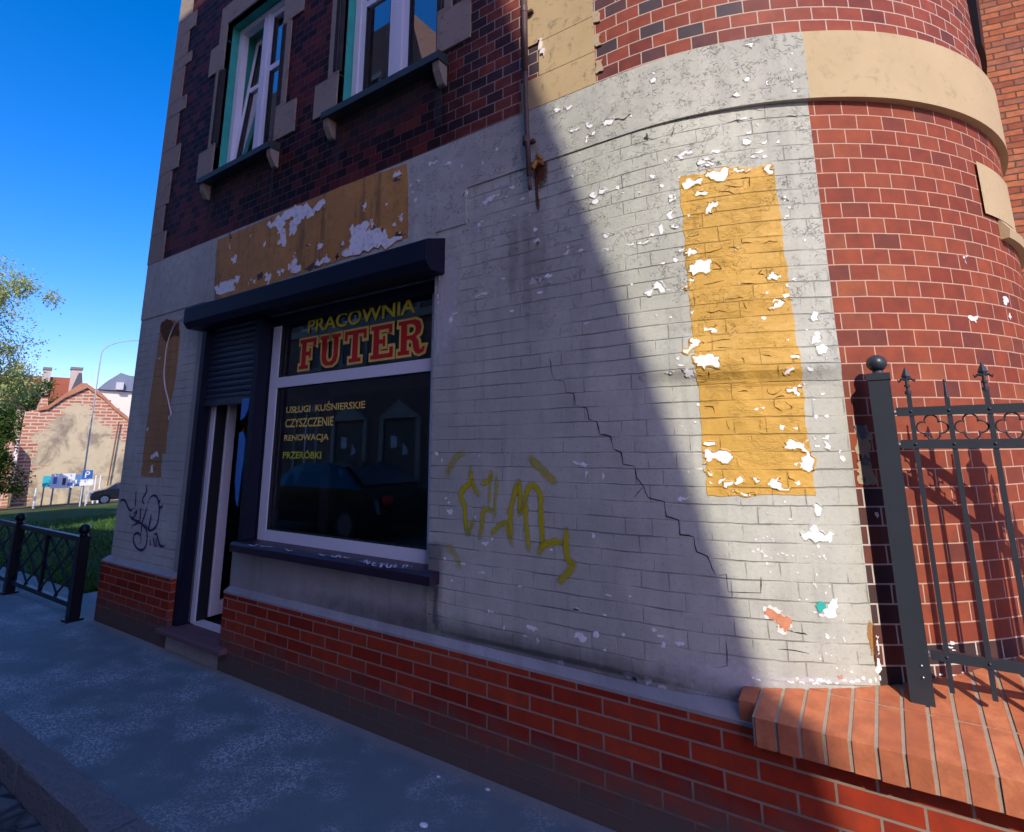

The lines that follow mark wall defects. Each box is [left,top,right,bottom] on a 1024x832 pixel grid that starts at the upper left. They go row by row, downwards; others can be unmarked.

corrosion [534,163,547,209]
peeling [626,115,779,246]
peeling [214,197,406,296]
peeling [630,247,715,298]
crack [690,234,778,313]
peeling [761,270,796,320]
spalling [160,319,179,342]
peeling [666,324,722,379]
peeling [783,353,825,400]
crack [549,358,762,593]
peeling [687,424,877,503]
spalling [763,605,792,635]